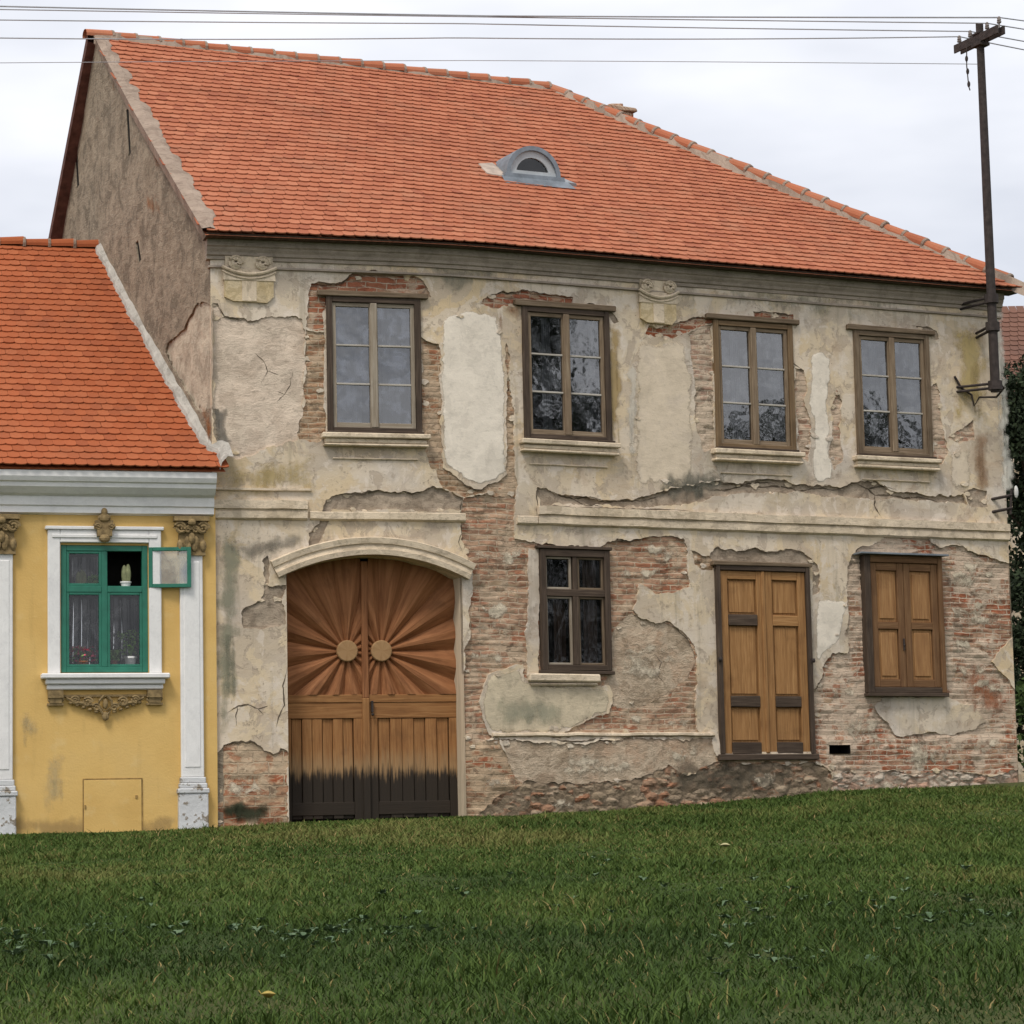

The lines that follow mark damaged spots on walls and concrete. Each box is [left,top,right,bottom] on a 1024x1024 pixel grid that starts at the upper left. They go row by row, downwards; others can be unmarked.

flaking render [167,270,430,460]
flaking render [481,290,573,309]
leakage [219,543,239,691]
flaking render [308,316,1018,816]
crack [229,672,287,727]
flaking render [217,740,288,827]